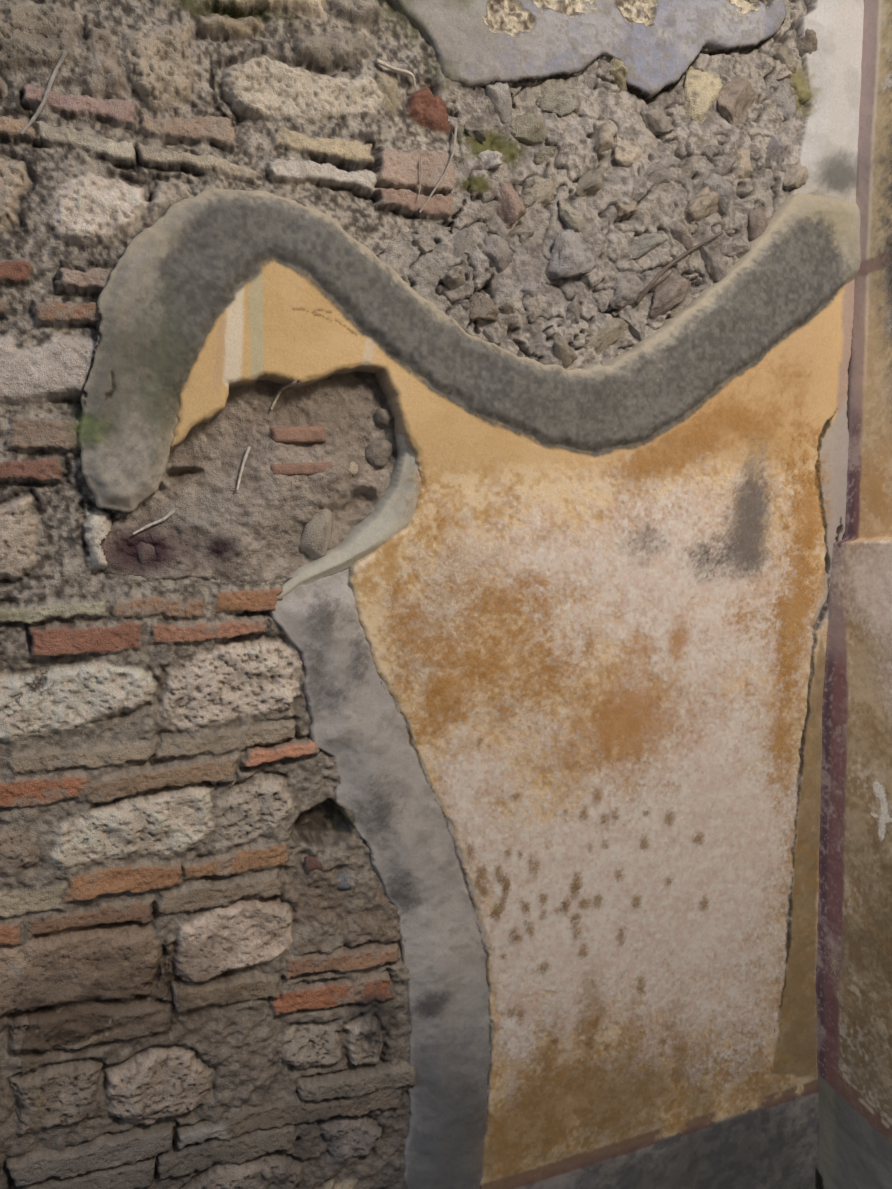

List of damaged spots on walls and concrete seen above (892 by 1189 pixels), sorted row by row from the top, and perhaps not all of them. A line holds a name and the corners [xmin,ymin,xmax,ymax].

spalling [377,0,818,370]
water stain [825,154,859,190]
water stain [151,199,845,456]
spalling [100,372,397,585]
water stain [380,456,814,1095]
crack [774,347,852,1033]
water stain [829,540,892,713]
water stain [353,993,397,1050]